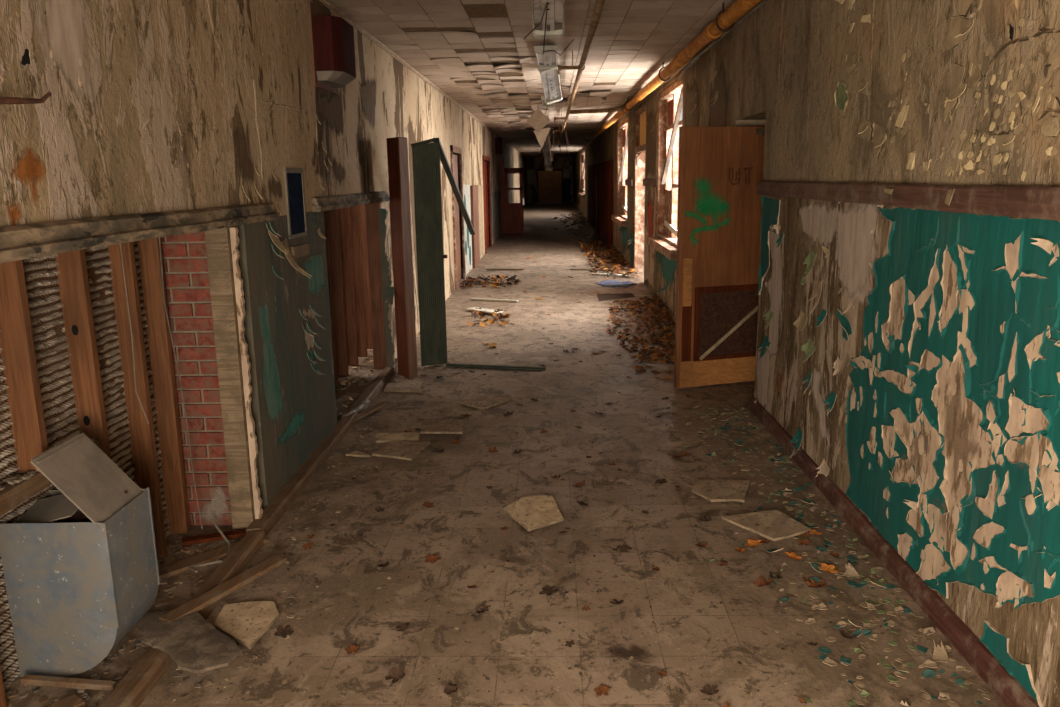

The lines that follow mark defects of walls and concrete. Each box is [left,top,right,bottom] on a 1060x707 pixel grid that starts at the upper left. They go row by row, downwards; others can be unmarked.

flaking render [836,0,871,33]
peeling [402,4,532,114]
flaking render [856,104,909,156]
flaking render [944,63,989,122]
flaking render [1017,85,1060,136]
rust [15,149,43,204]
flaking render [906,150,932,171]
flaking render [945,133,1005,205]
peeling [799,188,893,313]
peeling [846,231,1060,609]
peeling [665,224,991,707]